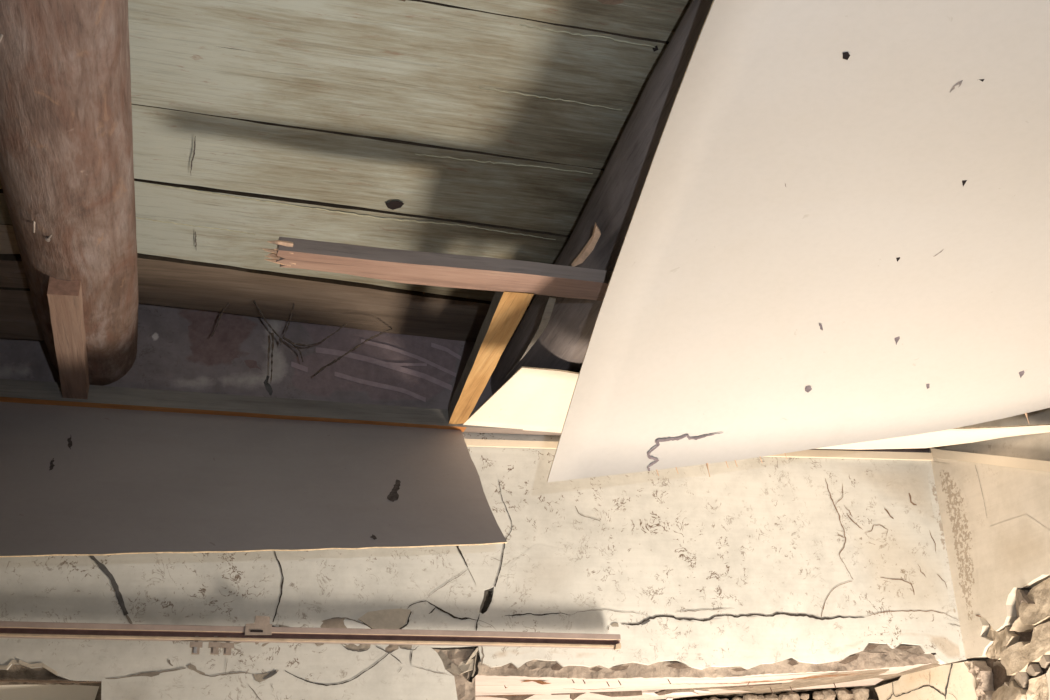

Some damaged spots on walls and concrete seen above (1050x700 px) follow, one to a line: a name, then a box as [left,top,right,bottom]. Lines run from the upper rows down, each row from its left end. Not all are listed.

crack [264,376,273,395]
crack [90,556,132,624]
crack [105,478,982,700]
flaking render [0,660,81,685]
peeling [320,609,411,629]
flaking render [344,644,417,653]
flaking render [432,643,940,700]
spalling [965,577,1050,700]